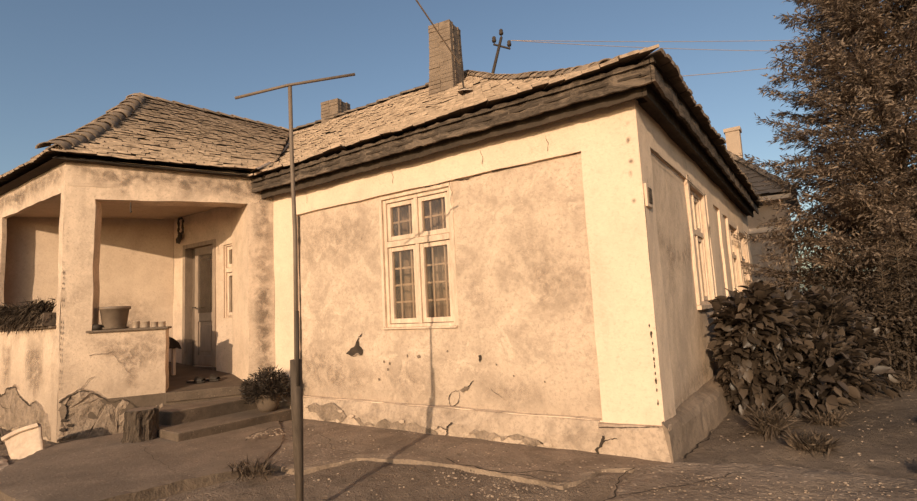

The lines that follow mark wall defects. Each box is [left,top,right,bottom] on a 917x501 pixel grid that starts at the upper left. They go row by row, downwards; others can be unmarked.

spalling [346,334,363,357]
spalling [0,320,137,442]
spalling [303,402,438,435]
crack [595,426,659,454]